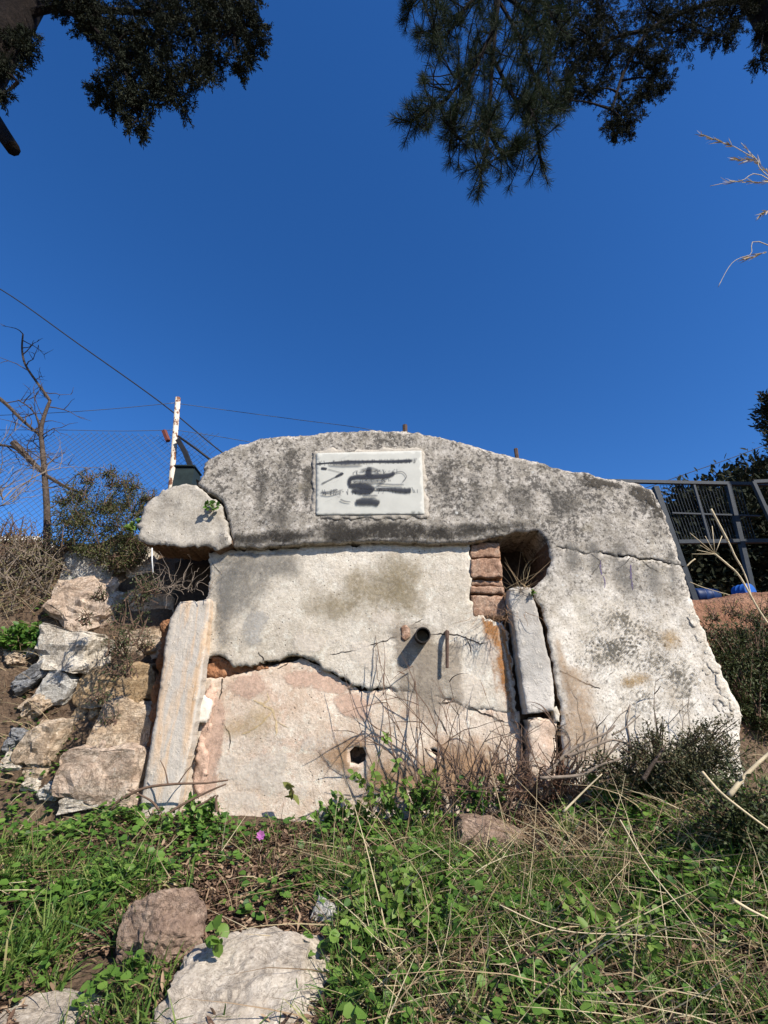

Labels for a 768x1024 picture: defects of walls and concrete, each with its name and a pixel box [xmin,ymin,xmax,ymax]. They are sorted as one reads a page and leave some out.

crack [559,547,685,575]
crack [208,619,503,746]
corrosion [483,617,514,718]